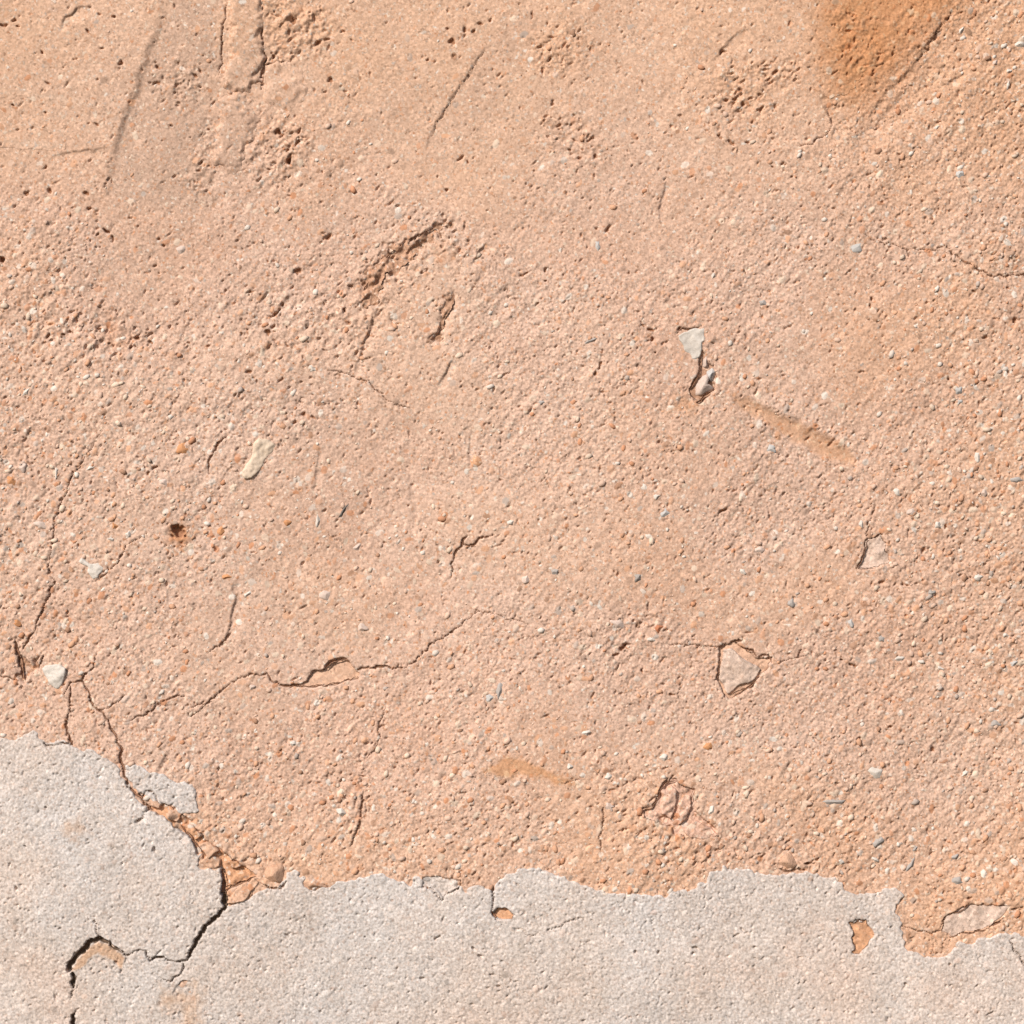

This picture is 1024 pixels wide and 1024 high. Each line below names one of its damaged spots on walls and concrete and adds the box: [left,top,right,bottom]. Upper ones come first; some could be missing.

spalling [677,326,716,403]
crack [23,449,92,648]
crack [451,535,492,577]
crack [357,611,526,671]
spalling [713,640,771,699]
crack [47,655,296,821]
spalling [142,790,256,892]
crack [350,796,364,846]
spalling [642,779,719,839]
spalling [491,888,513,919]
crack [67,891,228,1024]
peeling [849,920,874,953]